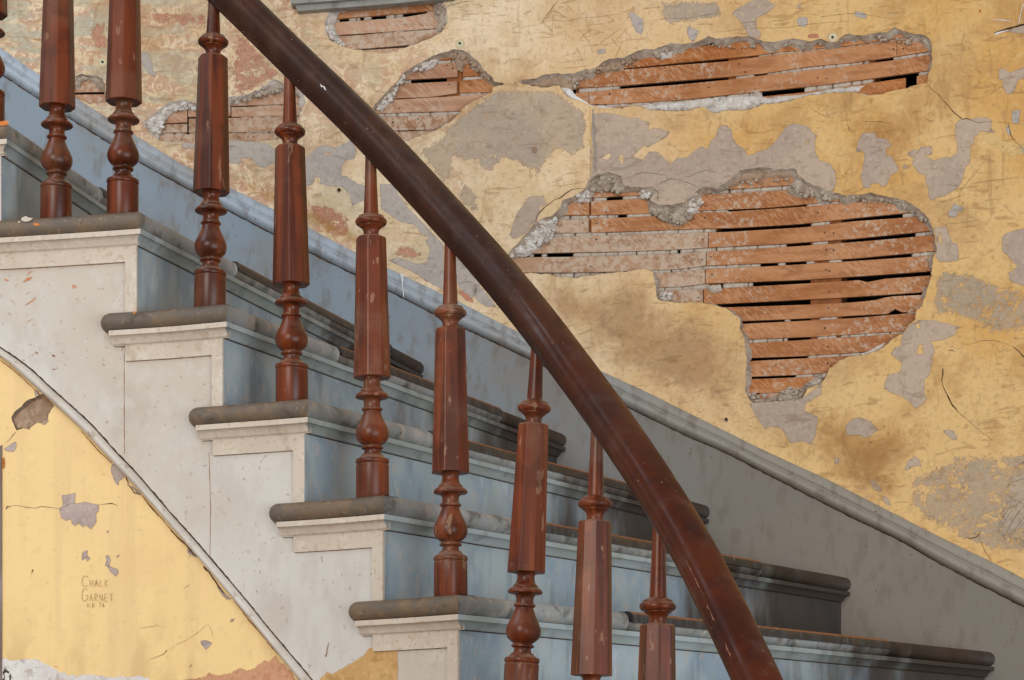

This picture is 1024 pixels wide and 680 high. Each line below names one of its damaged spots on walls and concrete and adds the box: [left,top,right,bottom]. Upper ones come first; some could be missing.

flaking render [324,2,447,53]
flaking render [142,100,196,149]
flaking render [228,35,306,167]
flaking render [373,0,1024,445]
flaking render [1,390,54,452]
crack [941,340,1024,440]
peeling [59,493,99,529]
peeling [905,455,1024,551]
flaking render [2,658,150,680]